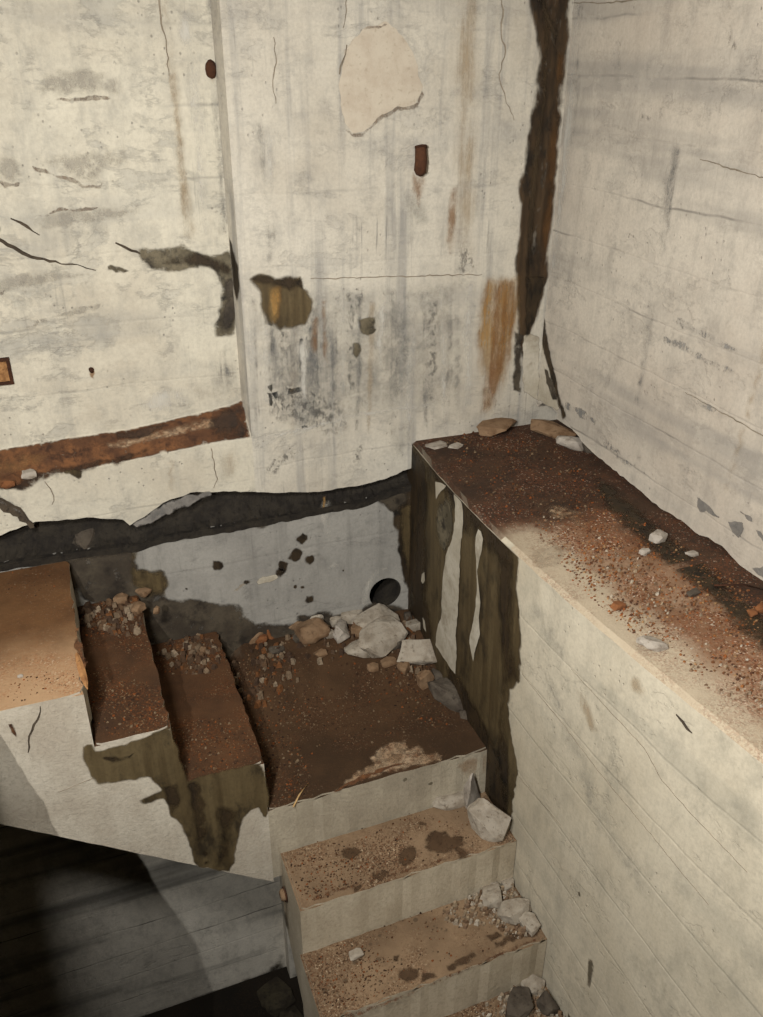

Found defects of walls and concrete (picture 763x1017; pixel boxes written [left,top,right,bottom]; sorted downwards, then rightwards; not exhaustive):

water stain [515,0,572,356]
crack [0,218,96,271]
crack [115,242,140,254]
spalling [140,239,239,336]
corrosion [465,281,516,392]
crack [542,322,565,419]
corrosion [0,401,249,490]
spalling [133,492,211,527]
peeling [697,498,763,541]
water stain [38,552,341,659]
water stain [362,444,521,817]
water stain [83,727,269,871]